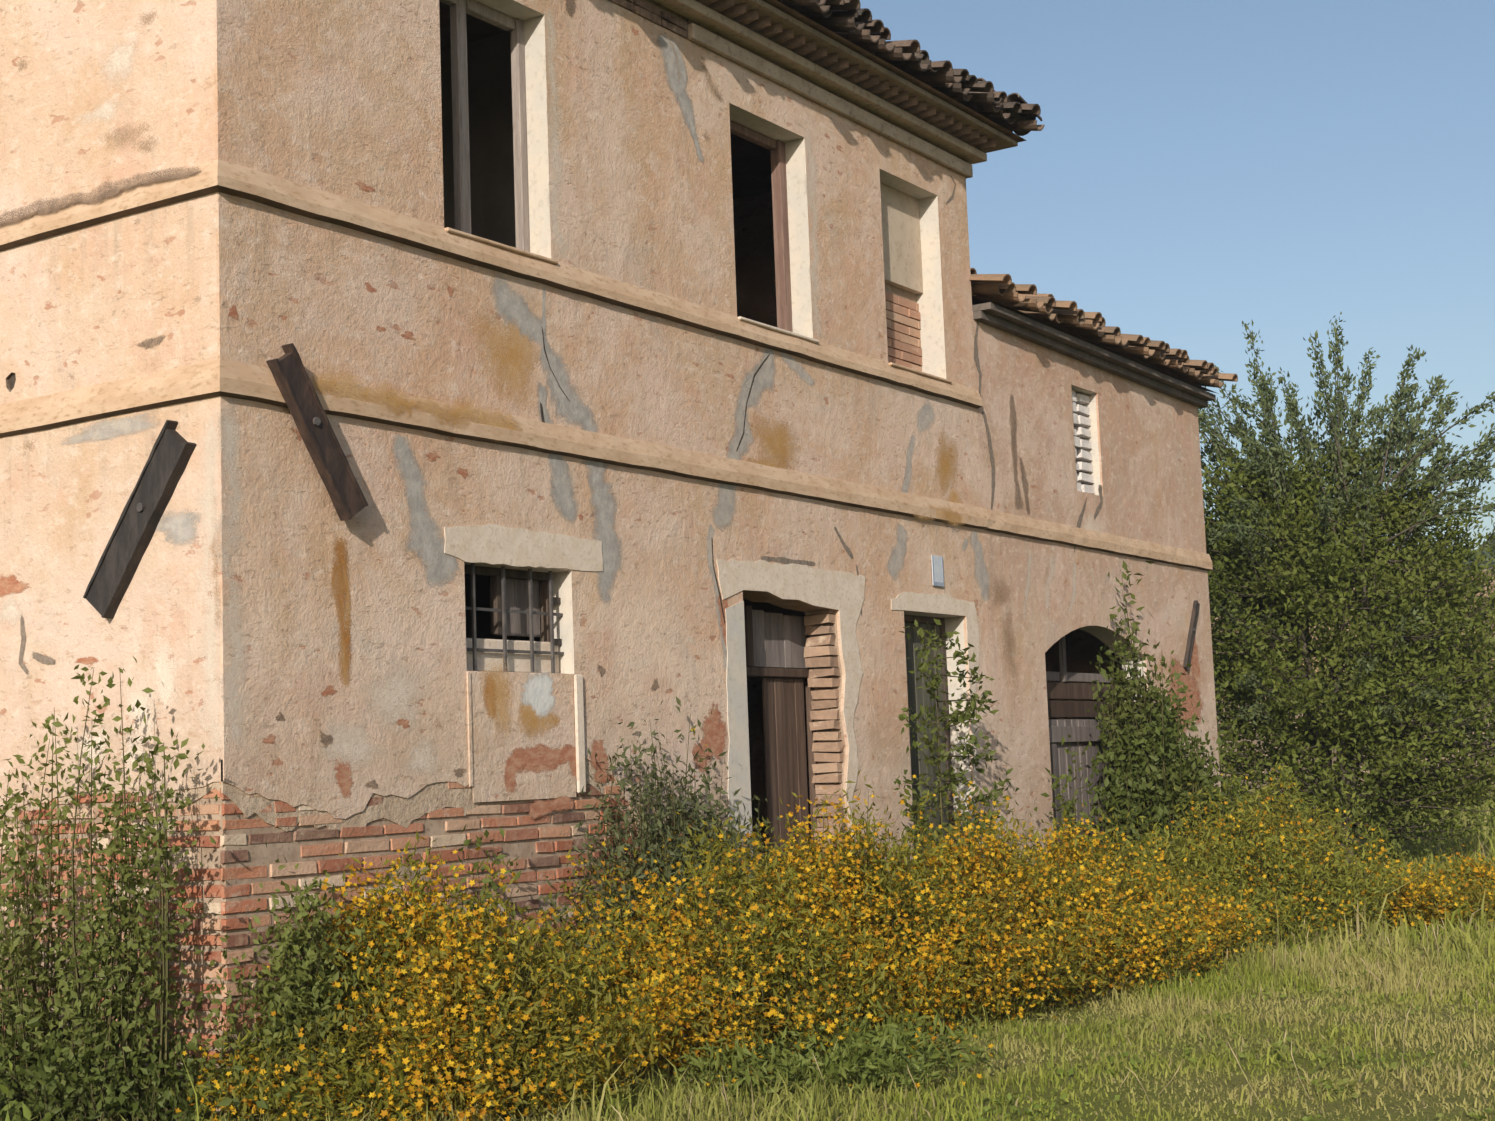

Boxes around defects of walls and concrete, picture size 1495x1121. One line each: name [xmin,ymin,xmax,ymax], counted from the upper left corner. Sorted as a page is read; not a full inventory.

leakage [0,122,200,226]
crack [491,273,625,607]
crack [706,348,815,670]
crack [761,399,936,614]
rust [330,536,353,687]
peeling [74,633,180,776]
flaking render [262,712,285,744]
peeling [520,671,557,720]
flaking render [692,702,729,774]
flaking render [0,731,727,1115]